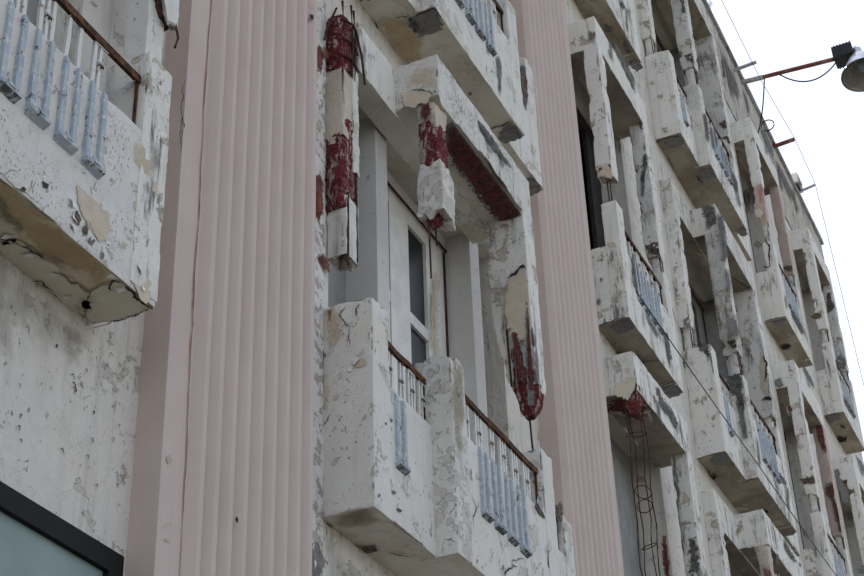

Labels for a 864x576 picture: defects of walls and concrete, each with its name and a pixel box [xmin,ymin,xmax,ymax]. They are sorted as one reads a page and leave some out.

spalling [407,7,444,37]
corrosion [317,45,329,72]
spalling [445,121,522,221]
peeling [71,185,113,259]
corrosion [316,175,324,223]
crack [0,238,44,259]
peeling [0,202,152,323]
corrosion [318,256,330,272]
crack [94,280,153,328]
peeling [504,264,534,406]
spalling [607,368,661,576]